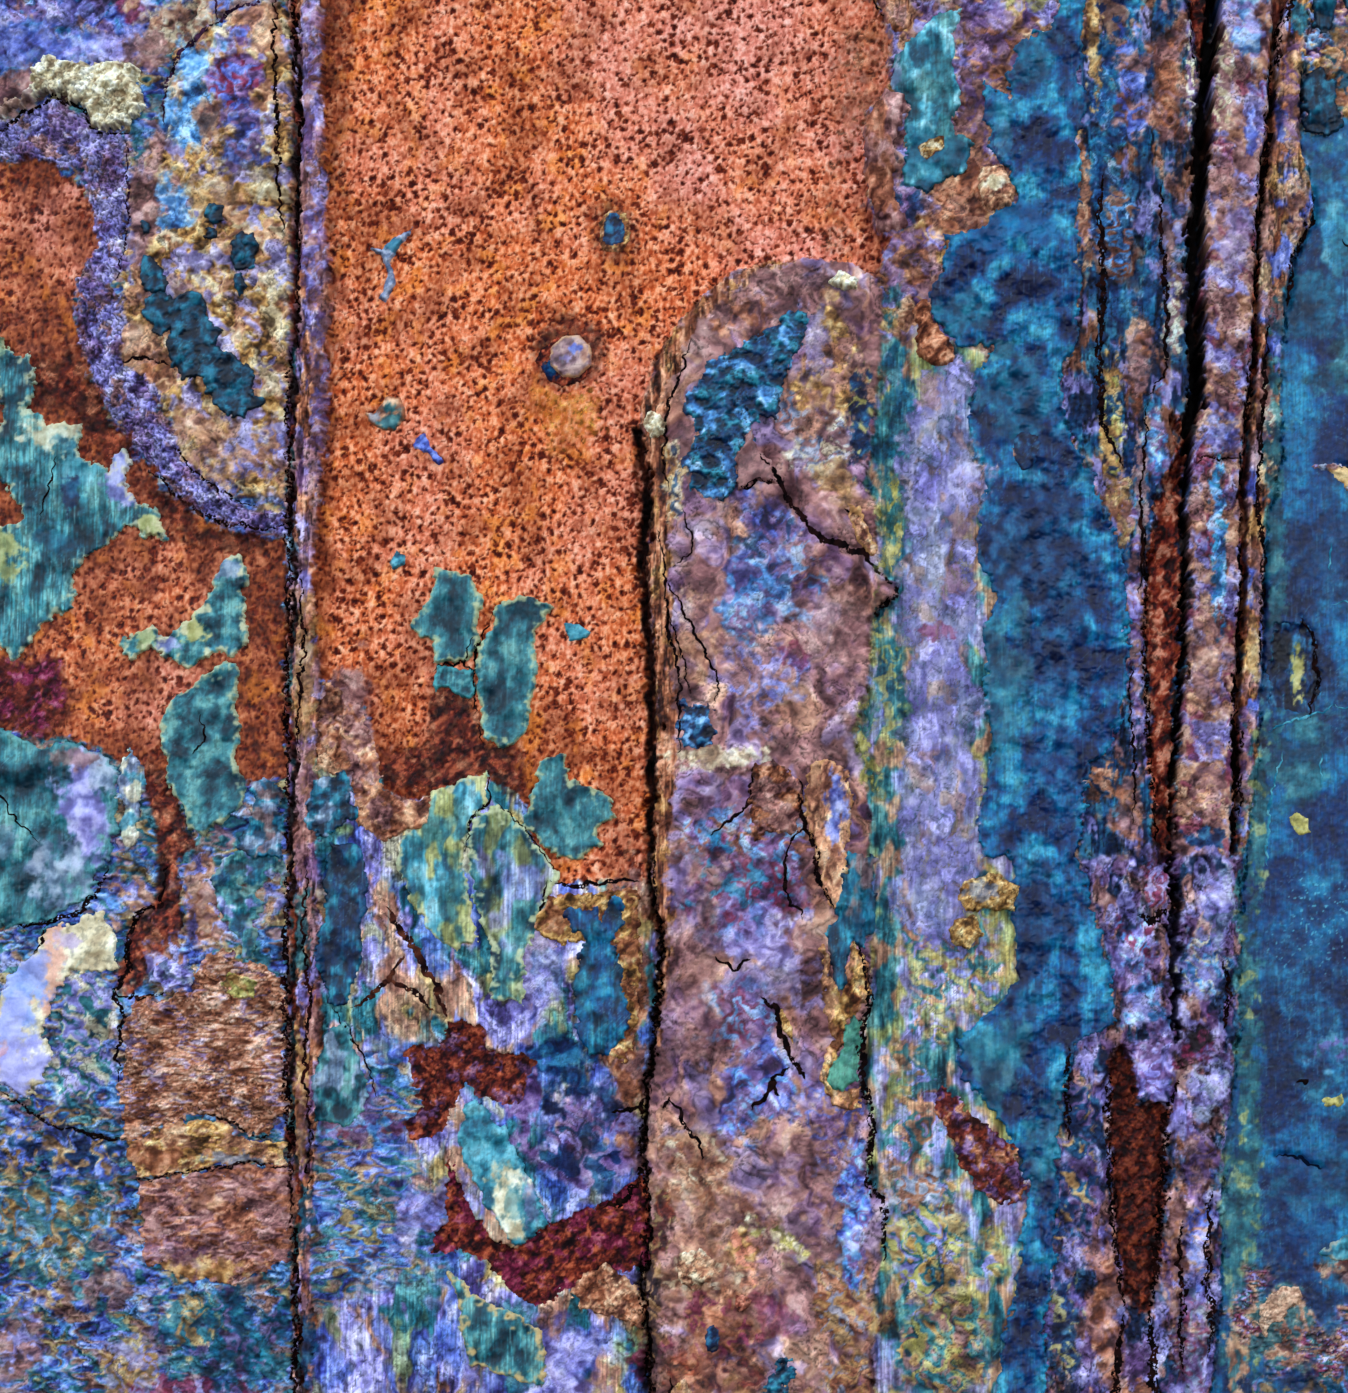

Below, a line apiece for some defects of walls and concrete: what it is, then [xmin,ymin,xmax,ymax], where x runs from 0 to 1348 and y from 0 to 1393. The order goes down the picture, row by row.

peeling [0,337,169,662]
crack [136,0,447,1393]
corrosion [314,681,527,842]
peeling [409,567,554,749]
peeling [564,623,591,641]
crack [657,340,720,753]
corrosion [747,759,854,909]
crack [741,454,899,621]
crack [111,866,168,1082]
corrosion [403,1019,538,1140]
crack [433,613,704,1393]
corrosion [429,1154,652,1329]